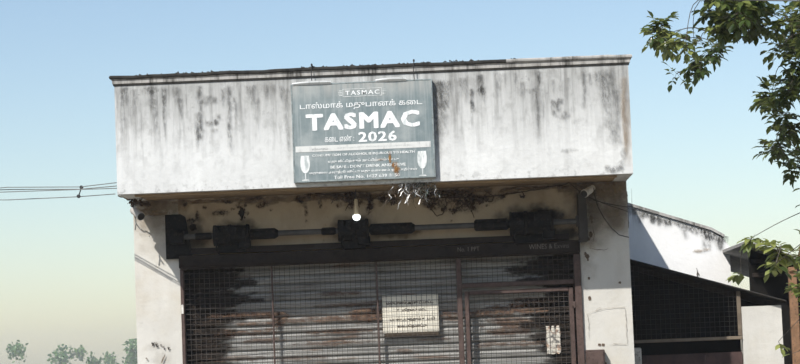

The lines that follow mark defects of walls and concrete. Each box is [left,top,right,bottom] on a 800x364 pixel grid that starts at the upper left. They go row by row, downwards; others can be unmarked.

rust [211,291,383,347]
rust [470,298,560,347]